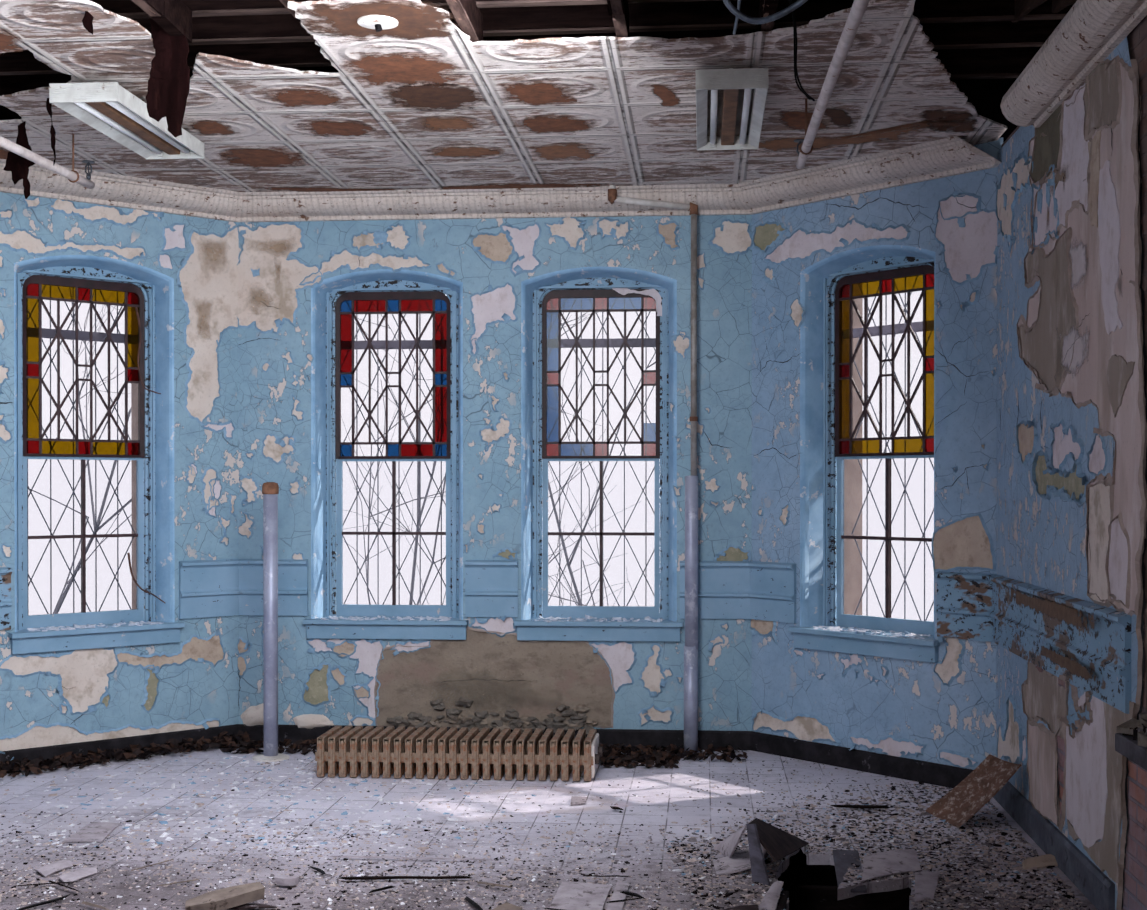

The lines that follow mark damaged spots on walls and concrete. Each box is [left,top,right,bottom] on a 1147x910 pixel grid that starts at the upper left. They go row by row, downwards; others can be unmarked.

crack [824,190,925,220]
peeling [0,197,457,444]
crack [932,335,988,423]
peeling [931,55,1146,635]
peeling [245,433,296,465]
crack [704,428,800,459]
peeling [1,544,13,558]
peeling [185,463,263,560]
peeling [27,620,163,632]
peeling [0,624,263,760]
flaking render [302,615,683,735]
peeling [996,642,1136,883]